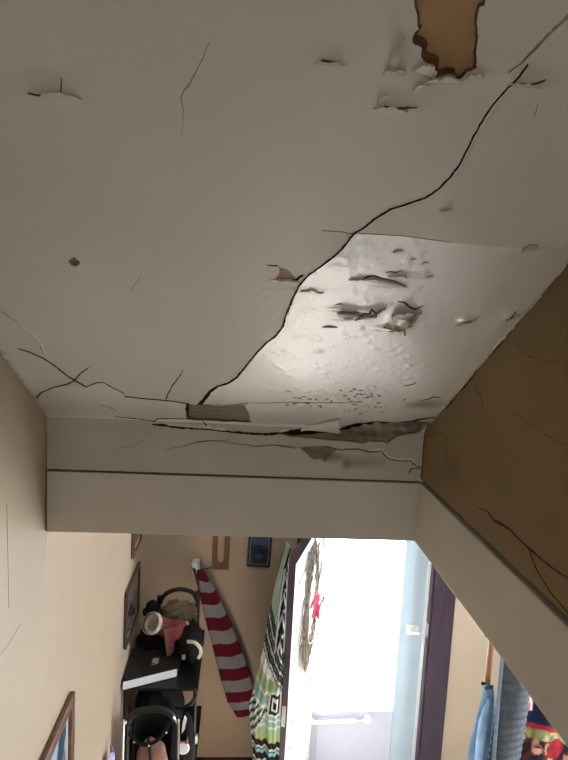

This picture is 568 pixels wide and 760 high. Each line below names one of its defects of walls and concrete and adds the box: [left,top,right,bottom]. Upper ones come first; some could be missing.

spalling [383,0,485,92]
crack [0,14,568,453]
spalling [268,265,324,294]
flaking render [187,403,251,423]
spalling [282,349,493,463]